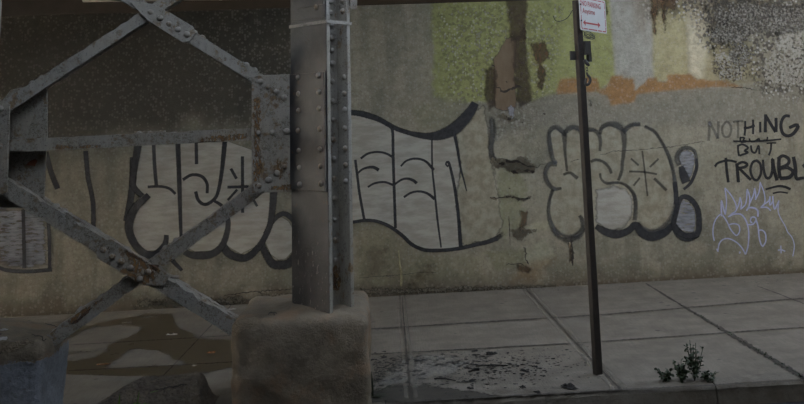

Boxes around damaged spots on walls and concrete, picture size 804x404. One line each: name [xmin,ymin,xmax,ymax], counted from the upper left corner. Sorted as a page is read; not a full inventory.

spalling [490,156,536,174]
corrosion [120,250,160,284]